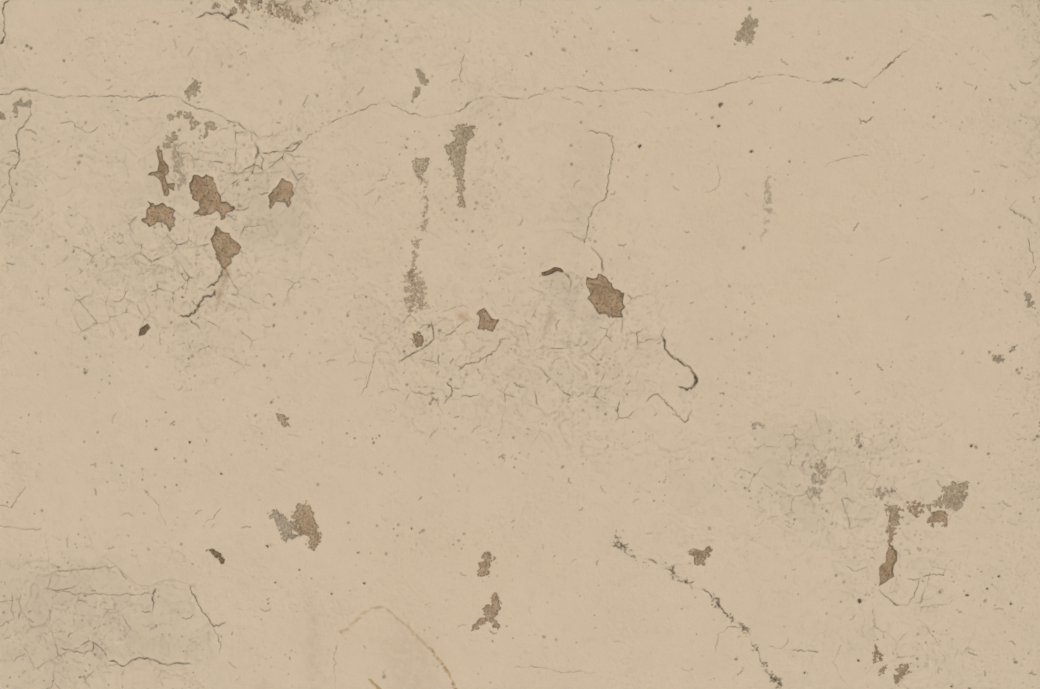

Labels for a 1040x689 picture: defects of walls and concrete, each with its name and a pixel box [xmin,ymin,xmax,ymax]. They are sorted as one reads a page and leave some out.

peeling [734,15,758,45]
flaking render [139,78,245,269]
flaking render [265,175,296,208]
flaking render [444,124,475,208]
crack [180,272,222,323]
flaking render [474,305,499,331]
flaking render [583,254,627,318]
flaking render [270,500,322,551]
flaking render [477,552,495,576]
flaking render [684,545,712,566]
flaking render [876,481,969,585]
flaking render [471,593,501,631]